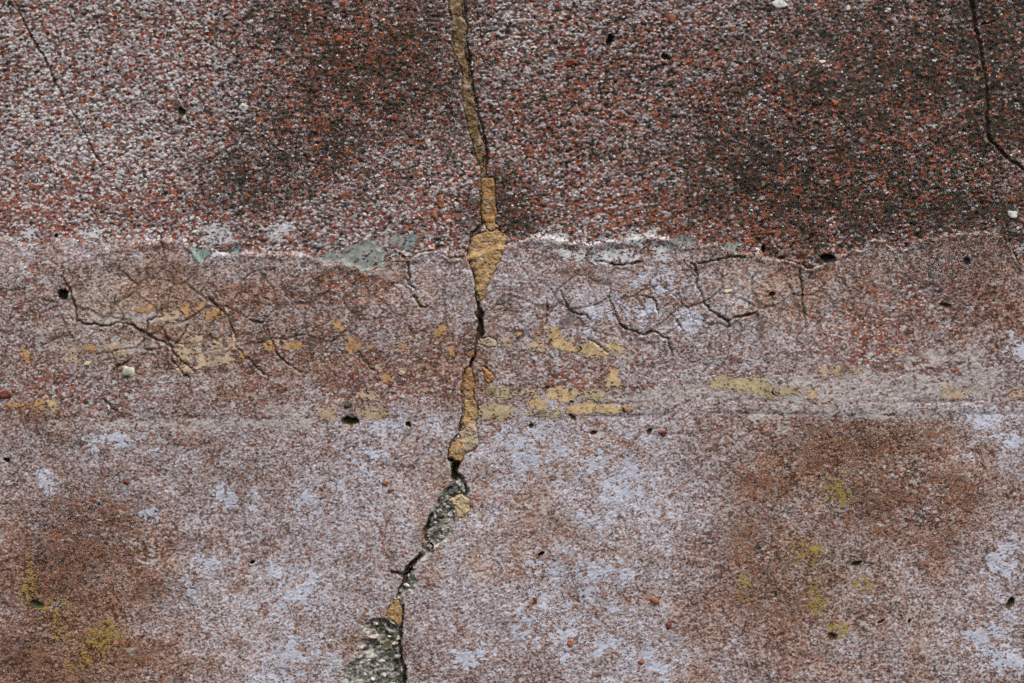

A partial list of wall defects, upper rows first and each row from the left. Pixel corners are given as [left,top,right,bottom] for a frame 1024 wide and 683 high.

crack [969,0,1024,172]
damp [490,0,1024,334]
crack [61,276,191,388]
crack [209,298,302,375]
crack [383,0,489,496]
peeling [433,324,455,358]
peeling [478,325,635,422]
crack [608,295,683,357]
crack [690,255,813,344]
spalling [393,460,471,599]
spalling [337,614,407,683]
crack [391,513,433,683]